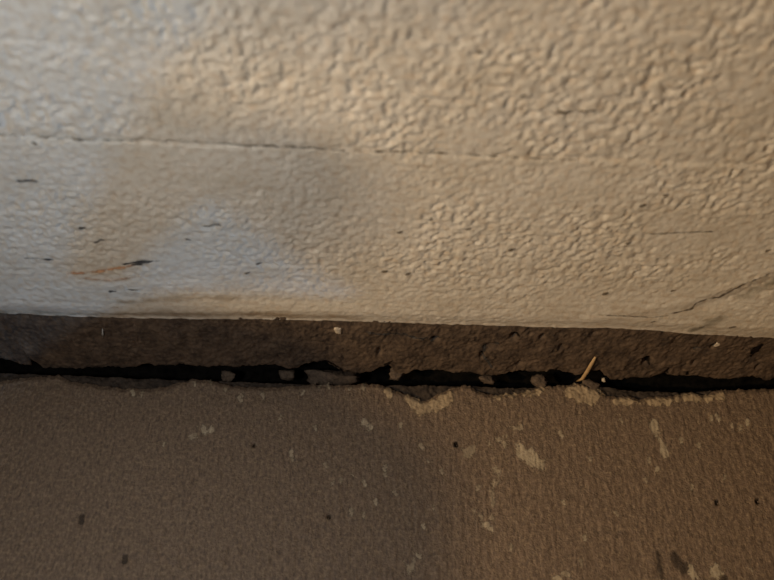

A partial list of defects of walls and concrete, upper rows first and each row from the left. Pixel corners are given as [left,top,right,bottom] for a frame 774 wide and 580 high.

crack [0,342,774,393]
spalling [383,385,459,417]
spalling [471,386,545,401]
spalling [565,383,725,407]